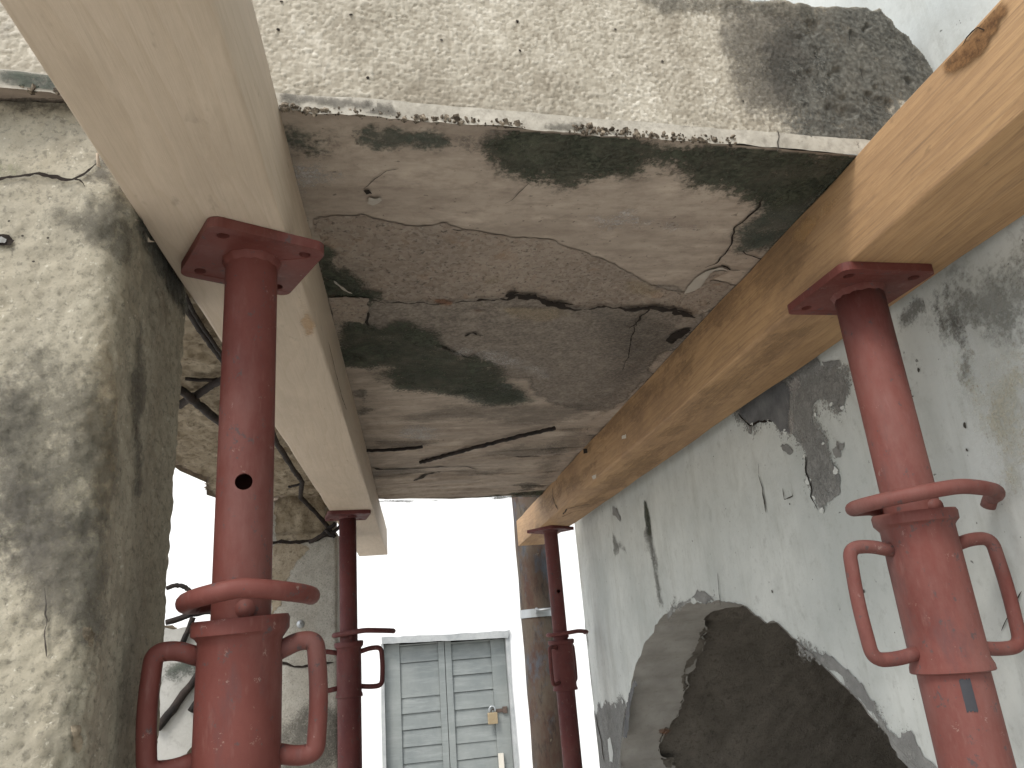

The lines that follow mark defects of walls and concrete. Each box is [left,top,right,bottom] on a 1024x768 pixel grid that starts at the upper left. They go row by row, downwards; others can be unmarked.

water stain [653,0,810,113]
crack [0,164,96,186]
crack [710,196,764,270]
water stain [734,172,835,254]
crack [365,292,695,370]
spalling [176,289,222,494]
peeling [732,357,851,514]
spalling [272,427,339,581]
peeling [667,589,715,621]
peeling [594,680,637,768]
peeling [796,637,936,768]